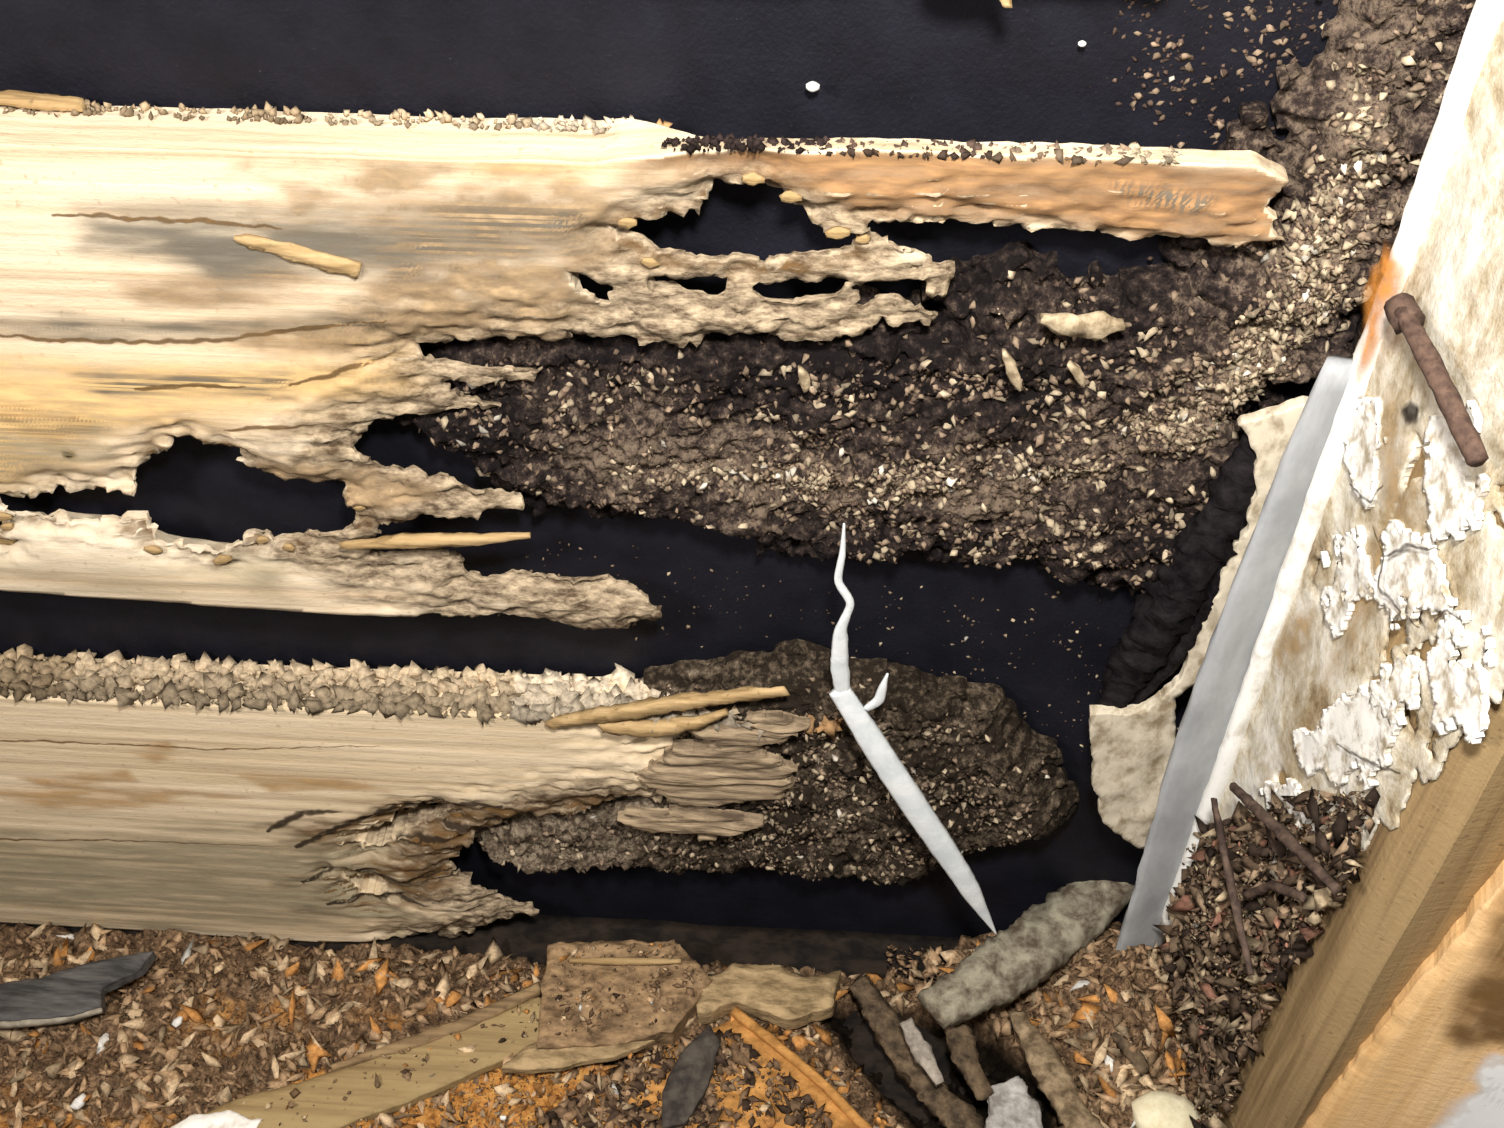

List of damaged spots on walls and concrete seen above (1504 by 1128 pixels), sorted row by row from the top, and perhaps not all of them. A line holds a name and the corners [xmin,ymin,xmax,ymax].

corrosion [1361,254,1402,366]
peeling [1182,9,1504,975]
leakage [1384,418,1401,522]
leakage [1346,597,1369,633]
leakage [1370,540,1384,577]
crack [1350,484,1463,657]
crack [1336,743,1401,774]